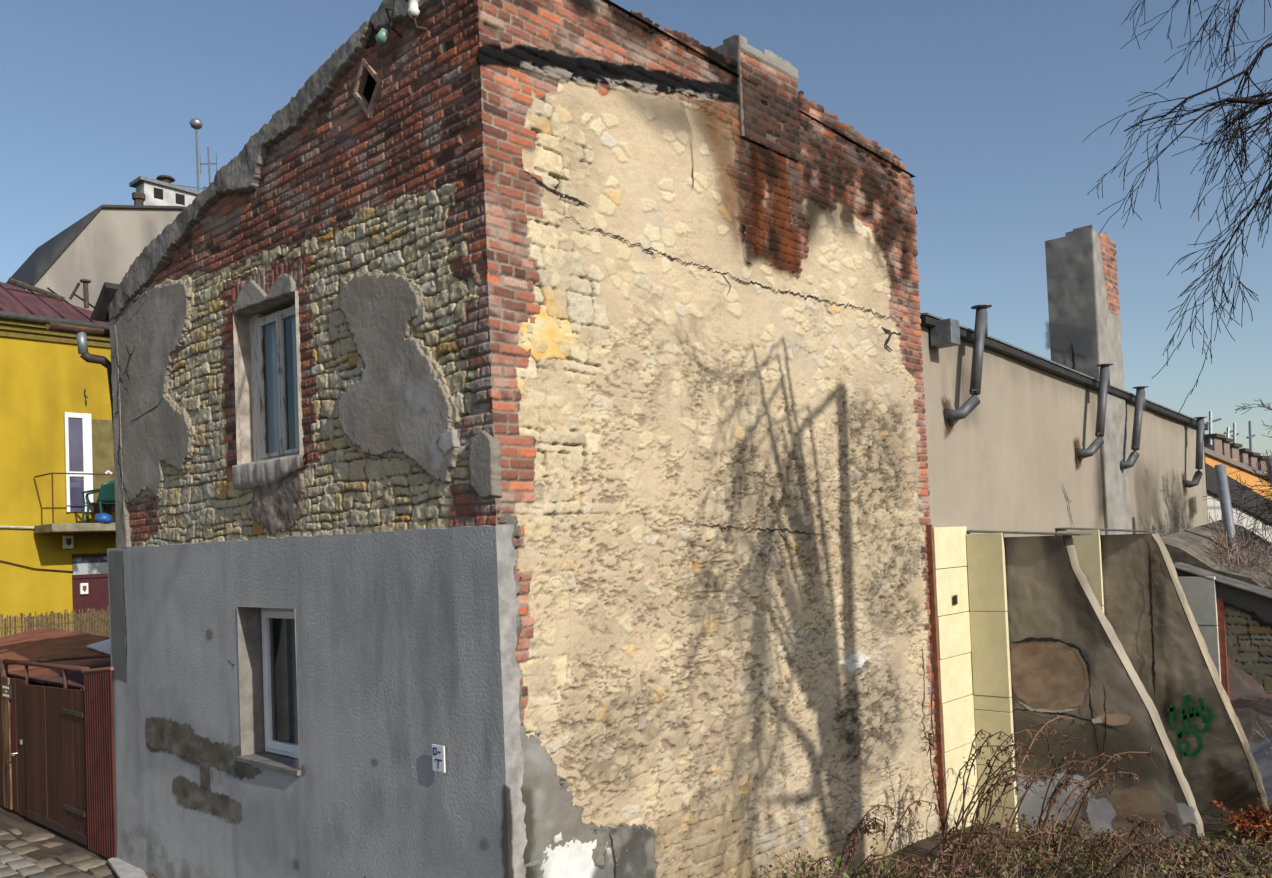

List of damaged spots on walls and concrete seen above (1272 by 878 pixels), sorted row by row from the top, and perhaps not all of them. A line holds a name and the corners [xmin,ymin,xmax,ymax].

peeling [522,62,717,100]
peeling [233,274,296,315]
spalling [520,305,579,362]
peeling [116,277,196,505]
peeling [337,270,503,500]
spalling [250,467,306,536]
spalling [1226,604,1272,628]
spalling [1009,637,1090,713]
spalling [1092,713,1132,726]